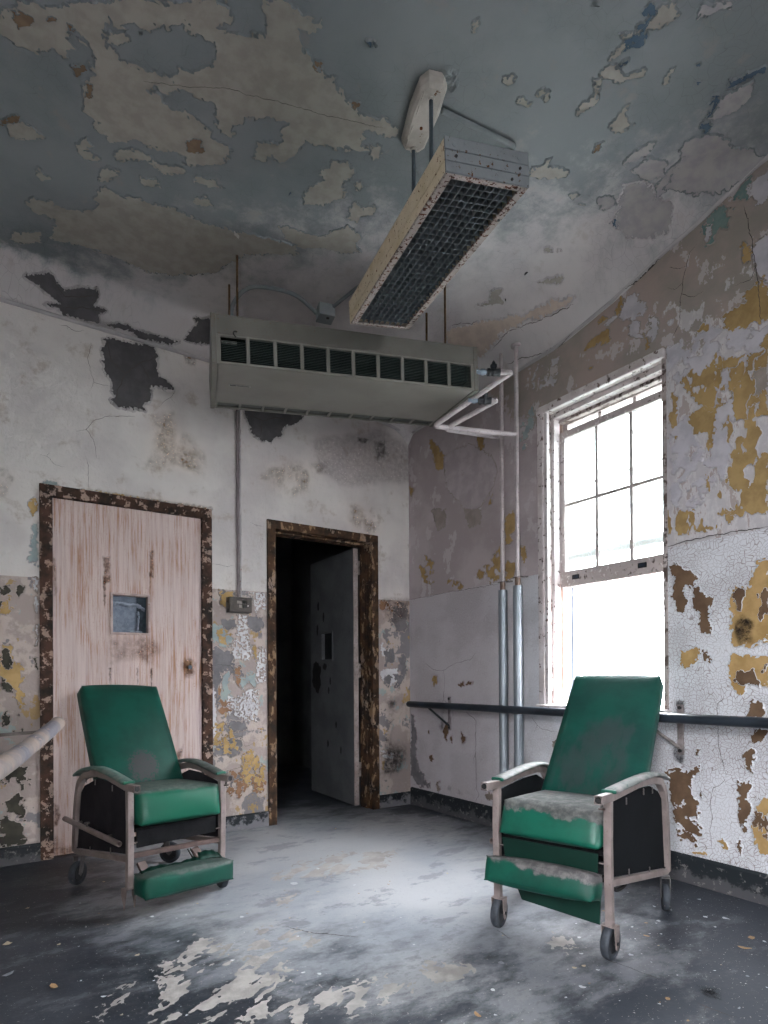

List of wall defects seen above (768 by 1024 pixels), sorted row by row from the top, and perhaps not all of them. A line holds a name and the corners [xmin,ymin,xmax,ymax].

peeling [0,0,399,224]
peeling [575,0,681,117]
flaking render [22,269,210,413]
peeling [666,232,768,536]
peeling [0,496,50,737]
peeling [476,509,528,585]
crack [668,526,768,547]
peeling [212,588,267,799]
peeling [664,557,768,857]
peeling [0,764,32,848]
peeling [148,933,233,1024]
peeling [198,976,398,1024]